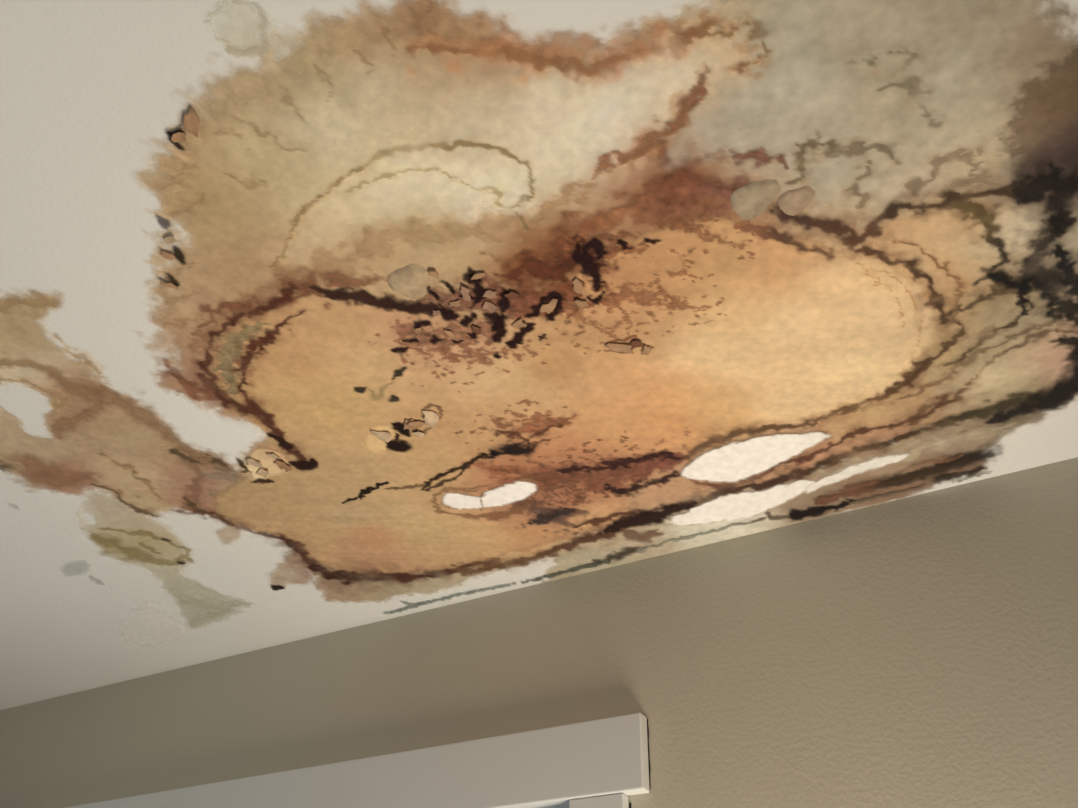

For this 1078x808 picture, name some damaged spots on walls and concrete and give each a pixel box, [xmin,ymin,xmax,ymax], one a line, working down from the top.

leakage [0,0,1078,629]
peeling [432,480,536,521]
peeling [670,432,908,525]